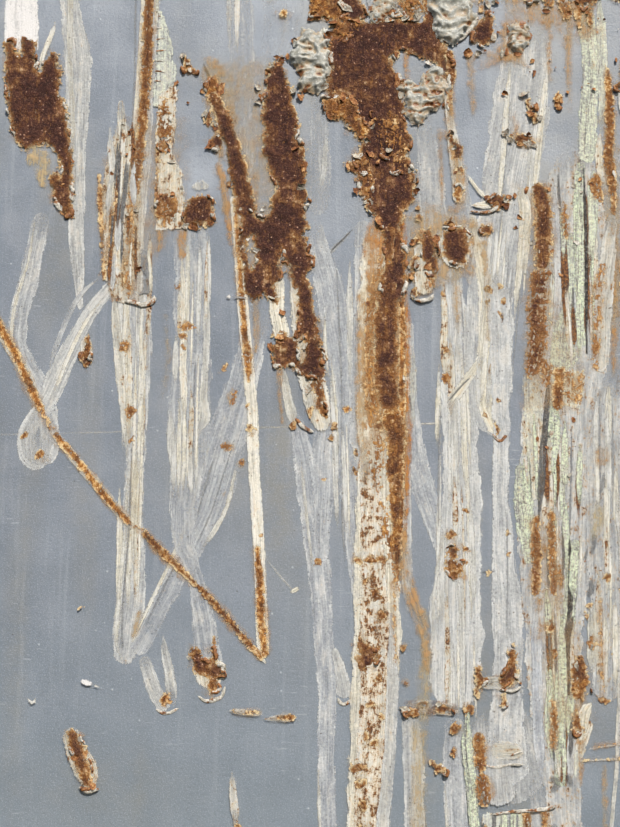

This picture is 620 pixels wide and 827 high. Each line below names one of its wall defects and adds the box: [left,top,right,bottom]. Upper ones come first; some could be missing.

corrosion [512,0,606,111]
corrosion [501,91,543,149]
peeling [124,251,156,307]
peeling [468,176,517,214]
corrosion [513,57,620,411]
corrosion [0,0,338,663]
corrosion [307,0,494,670]
corrosion [530,511,562,609]
corrosion [570,600,611,744]
corrosion [63,728,99,794]
corrosion [349,762,368,789]
peeling [469,797,556,827]